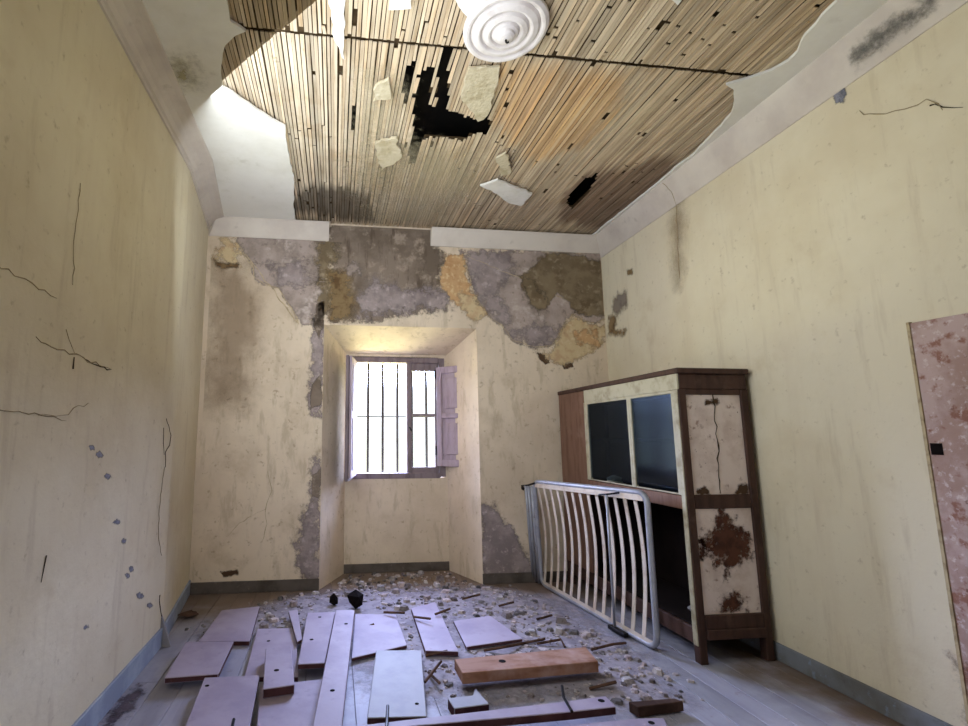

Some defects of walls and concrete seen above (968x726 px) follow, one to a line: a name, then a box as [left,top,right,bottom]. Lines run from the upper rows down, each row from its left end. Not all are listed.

water stain [852,0,933,60]
flaking render [221,0,834,235]
crack [859,99,963,115]
crack [0,183,81,298]
crack [36,329,112,370]
peeling [211,237,326,418]
peeling [440,249,605,365]
crack [0,403,88,421]